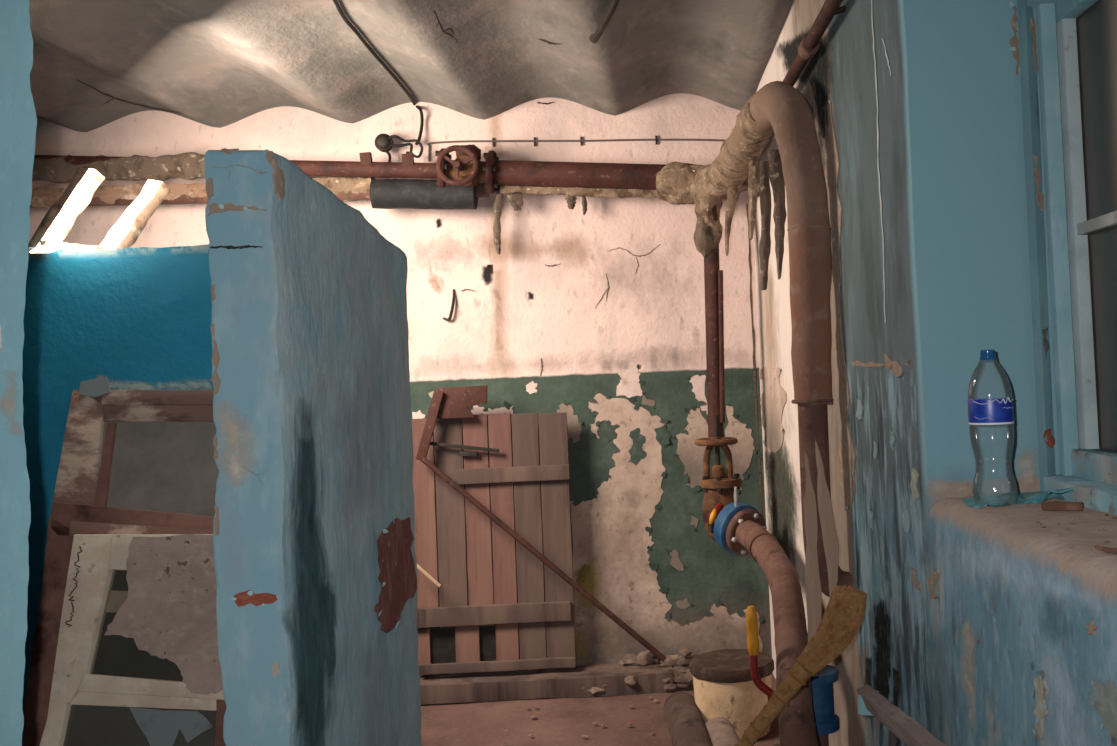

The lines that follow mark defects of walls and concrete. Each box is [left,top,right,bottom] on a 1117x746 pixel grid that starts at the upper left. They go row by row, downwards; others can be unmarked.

peeling [1009,1,1038,75]
flaking render [206,151,285,216]
crack [210,243,262,251]
peeling [823,101,910,511]
peeling [468,401,513,415]
peeling [526,381,537,394]
peeling [725,366,787,493]
peeling [557,364,764,667]
flaking render [232,590,278,607]
damp [291,415,335,746]
peeling [374,517,417,633]
damp [864,600,899,707]